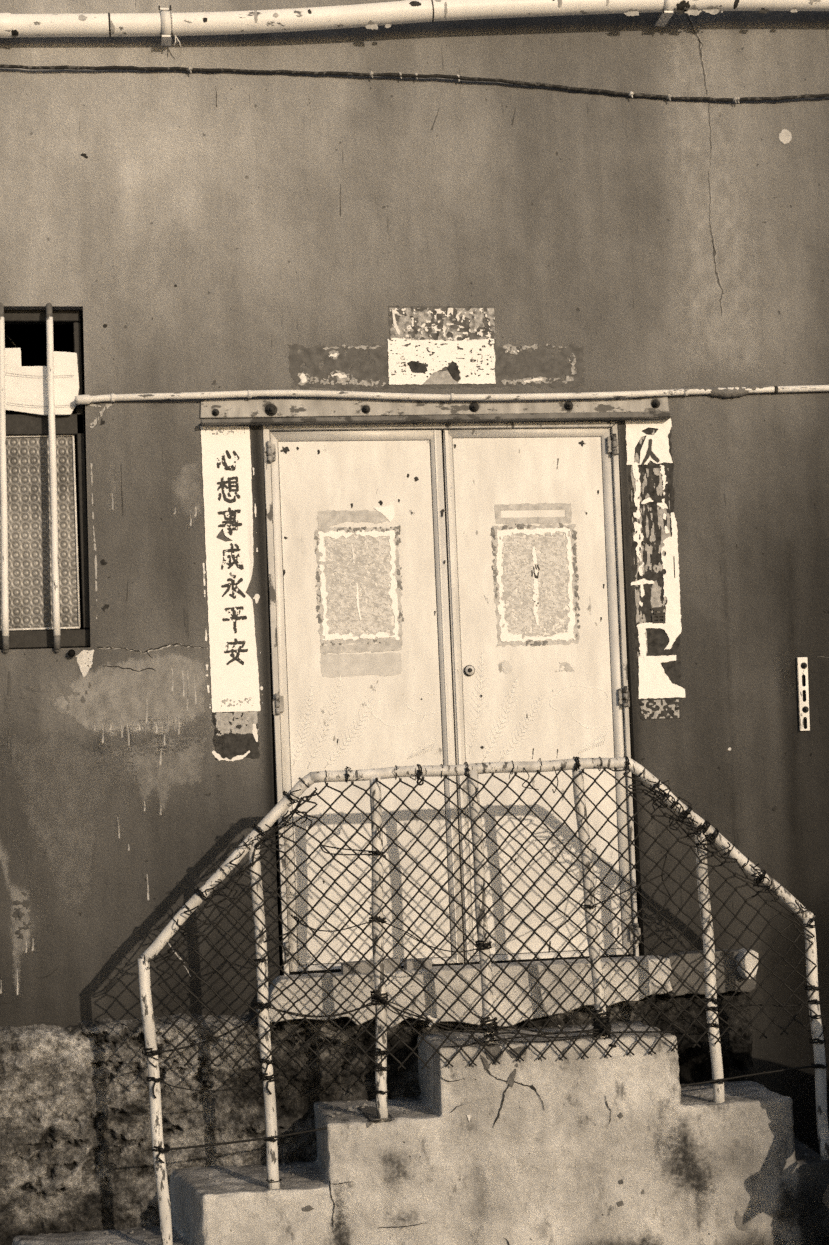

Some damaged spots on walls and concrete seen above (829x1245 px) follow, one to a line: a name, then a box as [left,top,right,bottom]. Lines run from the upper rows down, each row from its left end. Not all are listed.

crack [686,13,724,316]
water stain [8,652,207,905]
water stain [0,841,34,995]
crack [439,1058,545,1127]